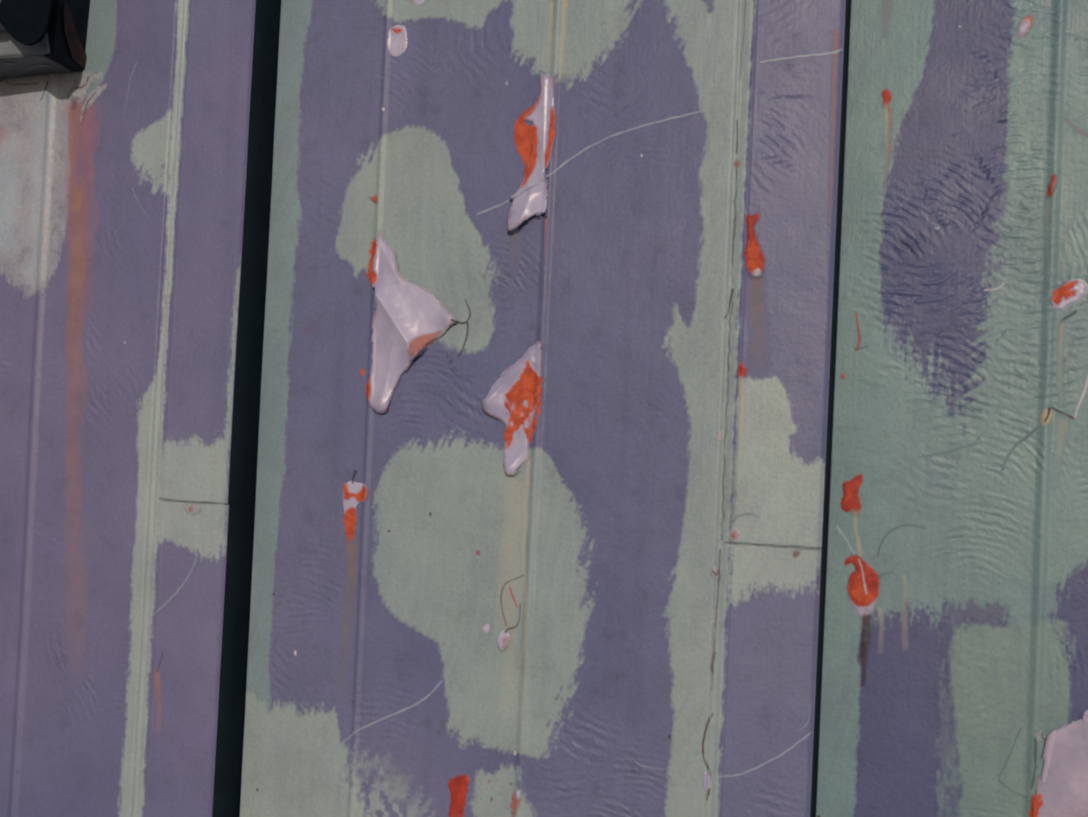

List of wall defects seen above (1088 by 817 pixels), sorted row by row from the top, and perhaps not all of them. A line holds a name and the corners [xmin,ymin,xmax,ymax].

peeling [507,73,558,276]
corrosion [58,96,103,687]
peeling [358,230,456,414]
corrosion [736,211,771,460]
corrosion [1001,173,1088,490]
peeling [481,340,545,756]
corrosion [836,472,909,687]
corrosion [446,772,471,817]
peeling [1026,710,1088,817]